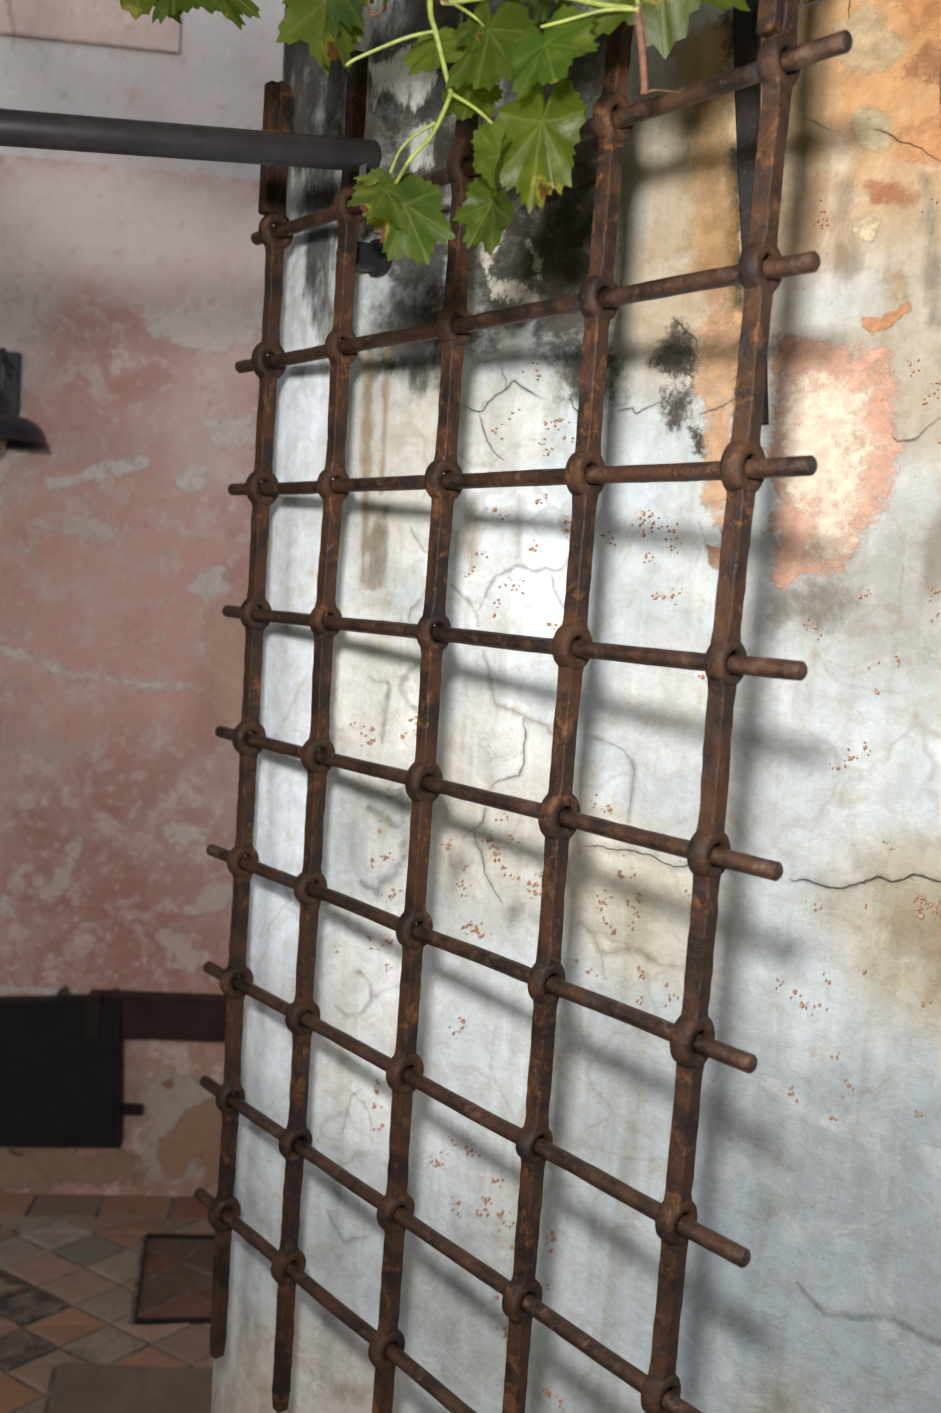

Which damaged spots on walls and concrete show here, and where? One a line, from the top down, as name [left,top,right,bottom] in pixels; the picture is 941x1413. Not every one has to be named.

leakage [284,41,348,137]
leakage [367,0,463,212]
flaking render [833,0,941,84]
leakage [295,167,338,337]
leakage [469,137,598,402]
leakage [648,323,706,457]
flaking render [695,310,742,462]
flaking render [767,302,920,589]
flaking render [701,480,726,569]
flaking render [186,563,246,720]
crack [585,845,688,867]
crack [789,873,941,889]